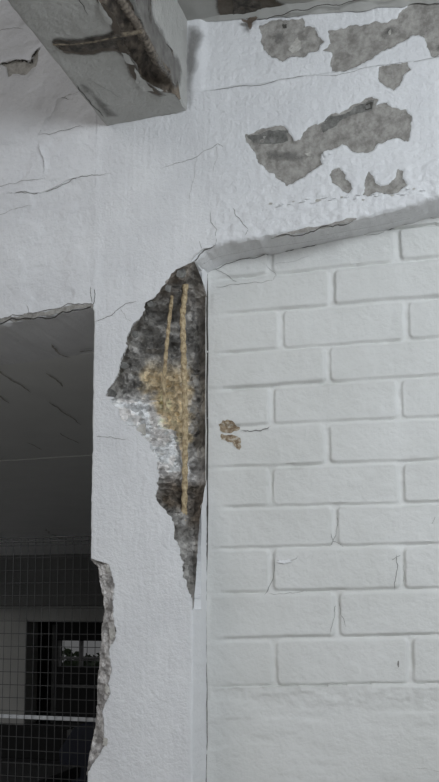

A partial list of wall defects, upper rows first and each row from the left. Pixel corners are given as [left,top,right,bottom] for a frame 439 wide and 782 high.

peeling [0,47,40,78]
spalling [52,0,181,100]
peeling [259,3,439,72]
peeling [378,62,411,91]
crack [0,81,122,215]
peeling [245,97,412,186]
spalling [106,262,207,608]
spalling [86,559,116,775]